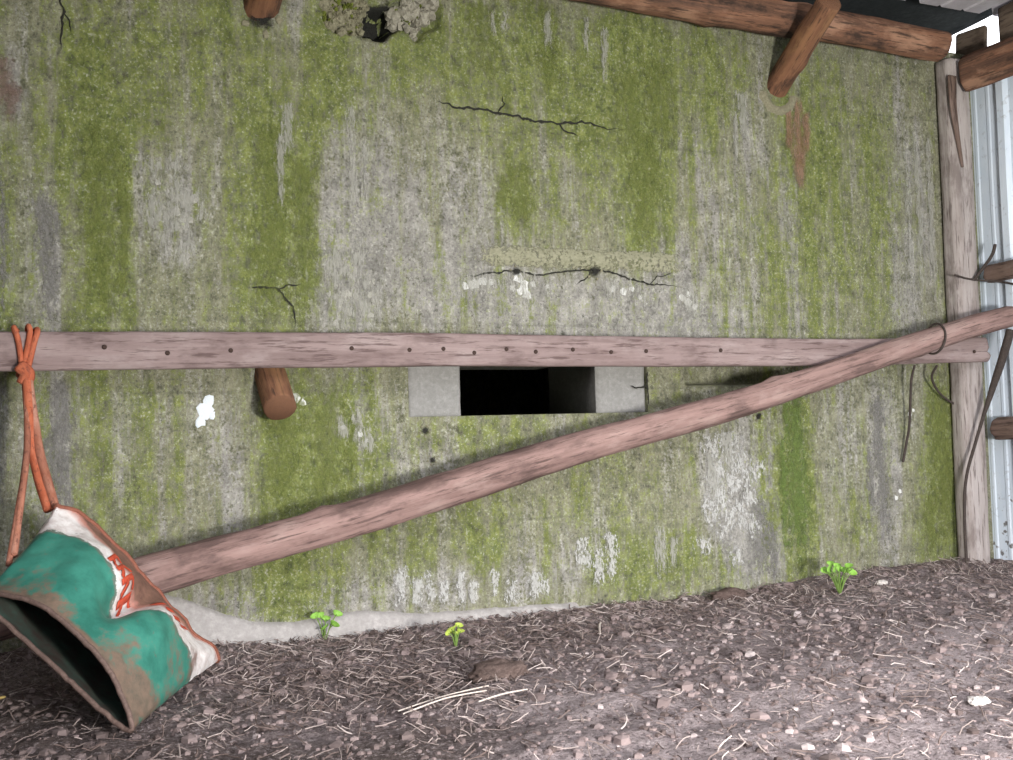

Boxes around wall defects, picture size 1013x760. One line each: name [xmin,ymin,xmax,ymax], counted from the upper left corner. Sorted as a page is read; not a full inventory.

spalling [319,0,439,42]
crack [439,96,623,136]
damp [733,91,748,157]
damp [248,104,319,309]
damp [904,133,937,299]
crack [466,269,691,290]
damp [751,397,813,576]
damp [866,394,890,539]
damp [575,532,618,582]
damp [655,528,678,567]
damp [393,568,479,607]
damp [490,569,549,602]